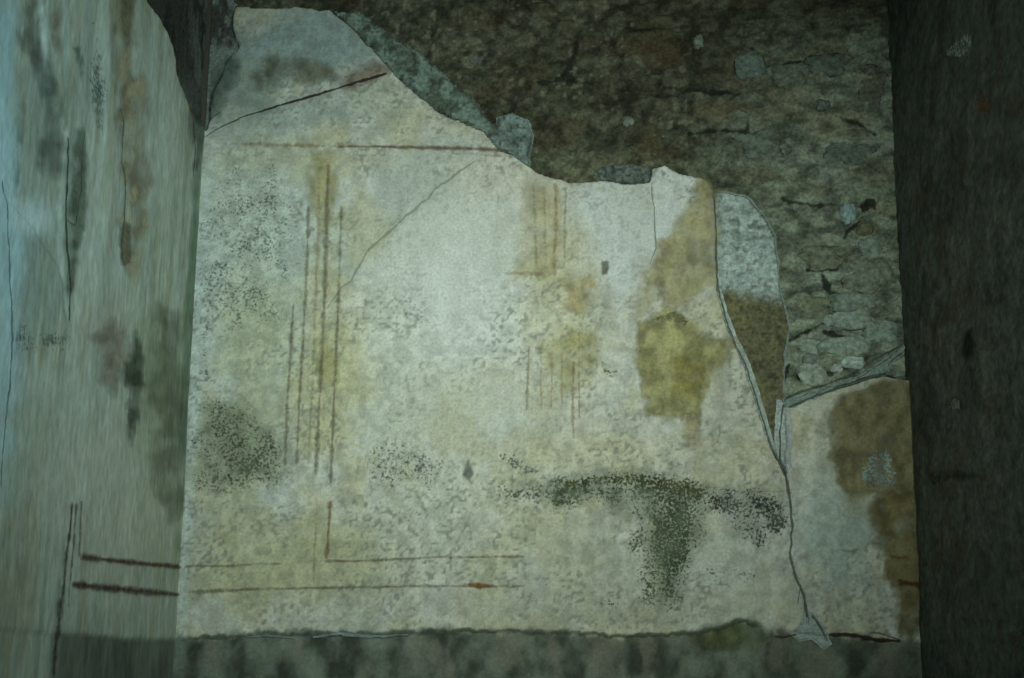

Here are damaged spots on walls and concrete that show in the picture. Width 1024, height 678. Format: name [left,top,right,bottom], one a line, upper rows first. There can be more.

crack [190,64,387,177]
crack [328,161,475,307]
flaking render [147,0,906,463]
leakage [188,400,284,493]
crack [713,197,907,650]
leakage [493,455,788,613]